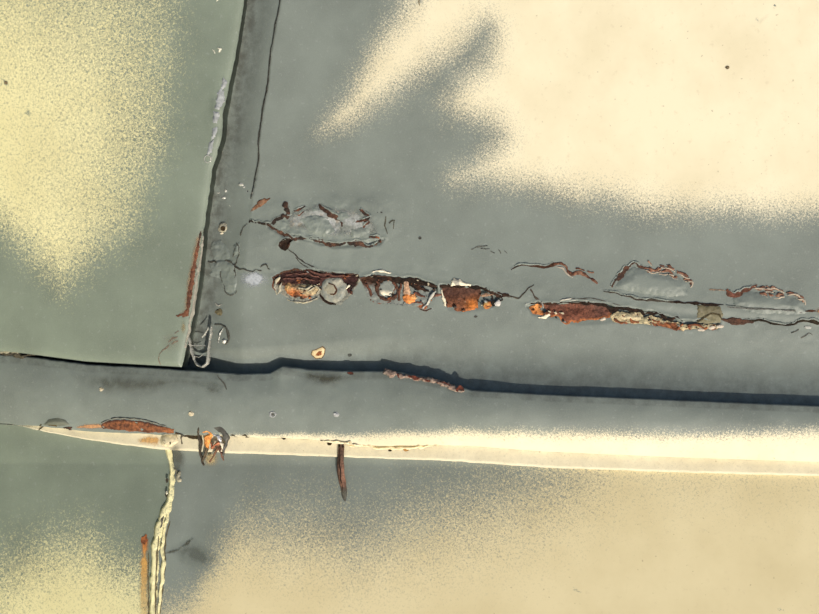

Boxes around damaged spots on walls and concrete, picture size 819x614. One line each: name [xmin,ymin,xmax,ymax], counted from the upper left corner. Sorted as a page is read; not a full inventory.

crack [250,0,280,199]
rust [176,231,204,348]
crack [510,260,819,338]
rust [383,369,464,393]
rust [78,417,174,443]
peeling [197,427,230,466]
rust [337,444,347,501]